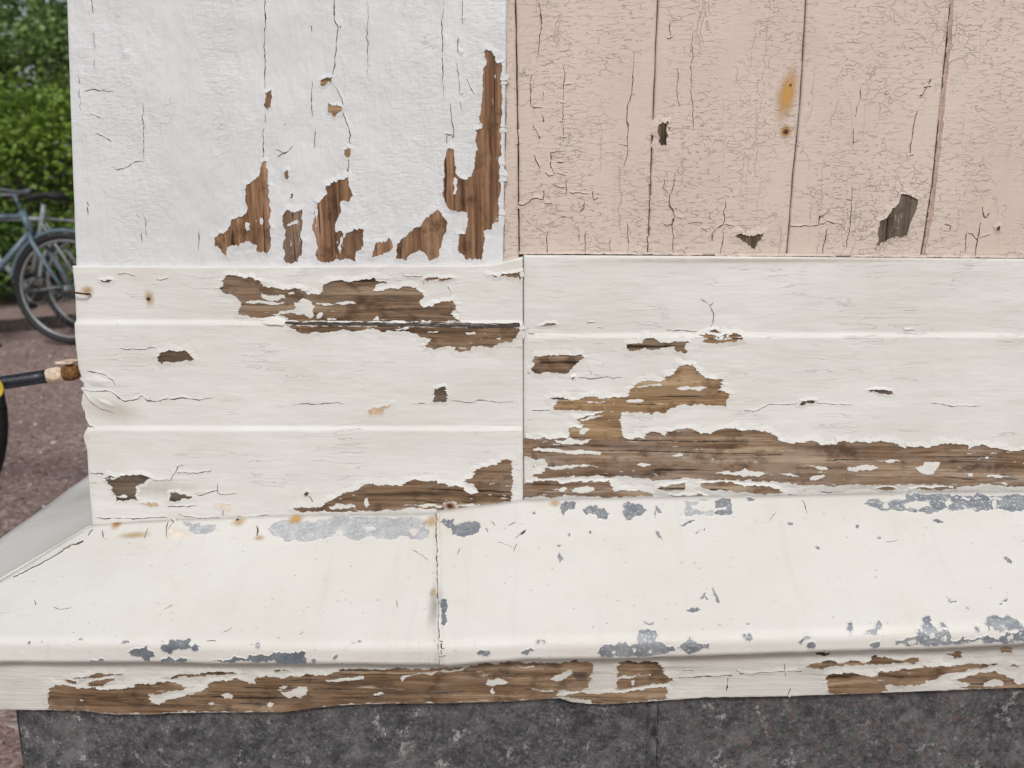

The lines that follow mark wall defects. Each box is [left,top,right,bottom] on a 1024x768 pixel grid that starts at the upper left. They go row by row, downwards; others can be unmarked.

crack [78,0,114,142]
crack [114,107,144,170]
crack [262,0,353,172]
crack [504,0,1024,259]
rust [780,77,794,111]
peeling [208,41,560,358]
peeling [869,187,924,253]
crack [81,370,213,427]
peeling [267,325,1024,544]
peeling [99,469,199,510]
peeling [41,621,711,715]
peeling [796,597,1024,695]